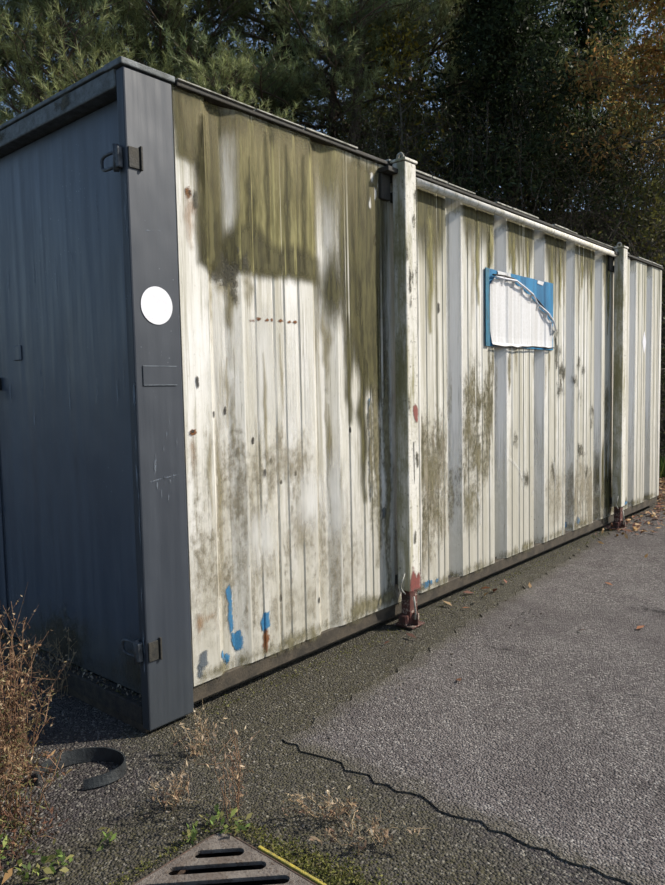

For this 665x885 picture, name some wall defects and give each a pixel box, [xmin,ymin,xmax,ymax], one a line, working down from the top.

water stain [196,118,209,257]
water stain [210,129,270,322]
water stain [463,203,494,302]
water stain [507,219,610,334]
water stain [322,323,331,367]
water stain [208,443,251,539]
water stain [345,321,392,587]
water stain [414,353,497,567]
peeling [197,650,208,679]
peeling [222,585,244,664]
peeling [261,611,271,652]
corrosion [410,570,421,592]